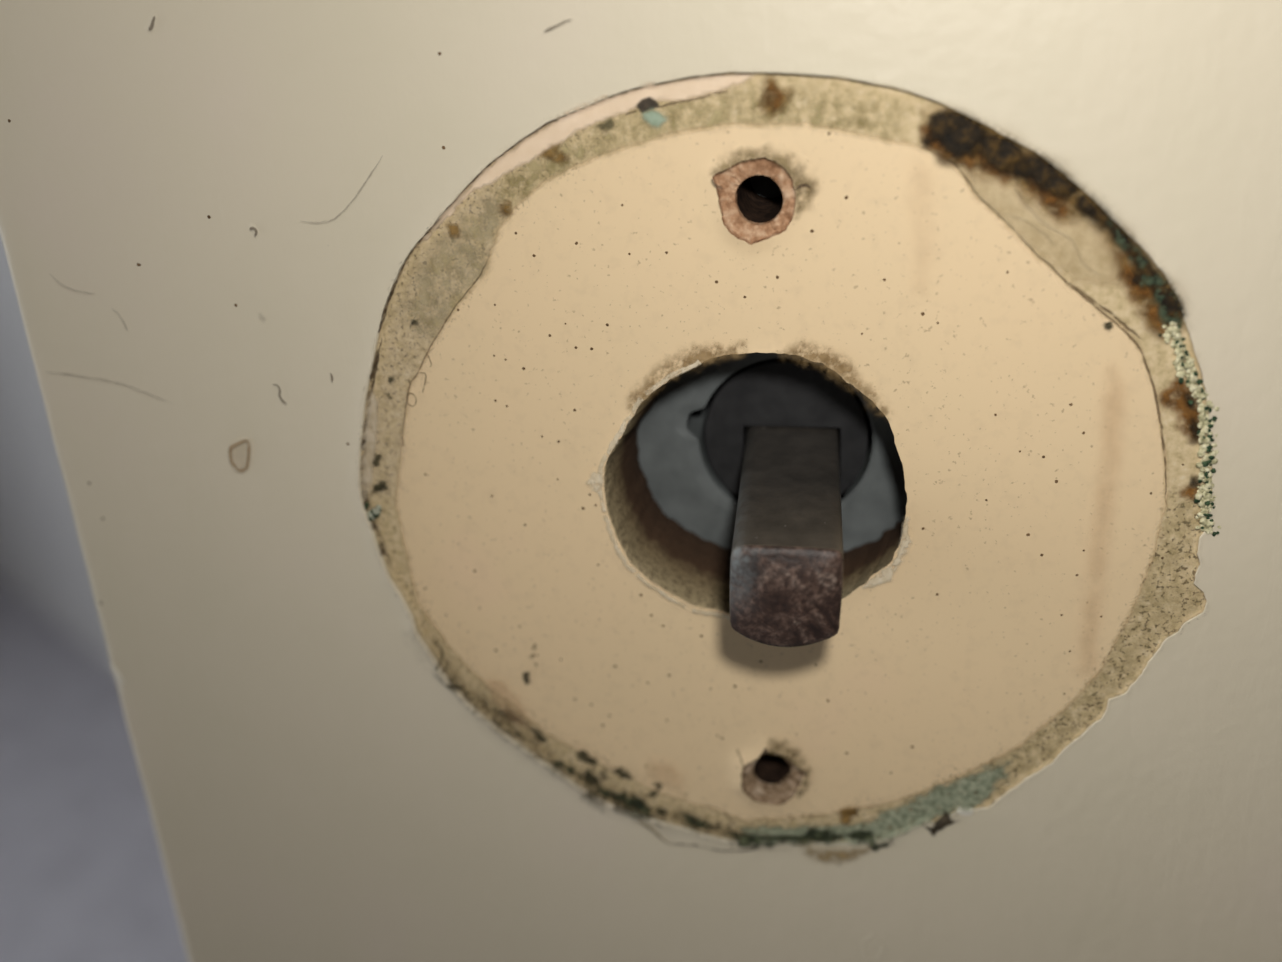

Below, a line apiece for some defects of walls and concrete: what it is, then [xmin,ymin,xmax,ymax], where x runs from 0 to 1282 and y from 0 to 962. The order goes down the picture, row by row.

damp [432,640,1006,851]